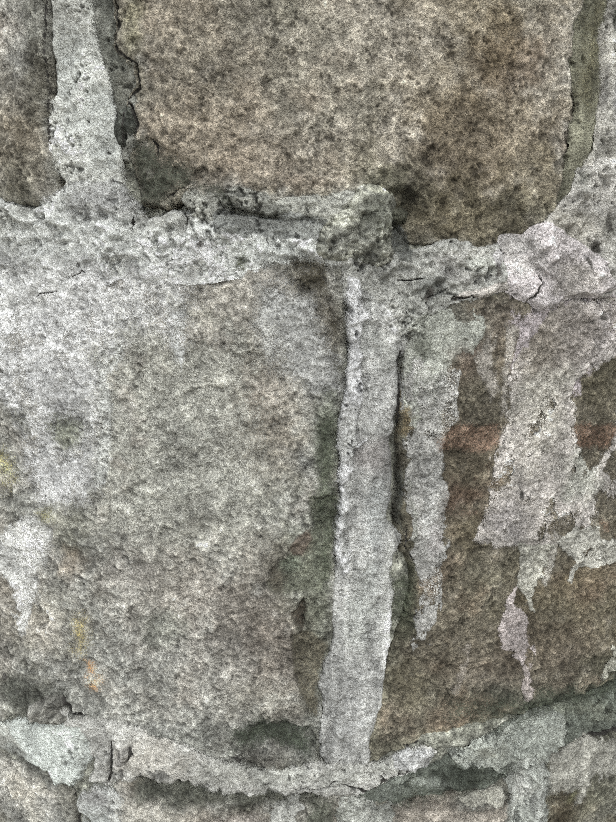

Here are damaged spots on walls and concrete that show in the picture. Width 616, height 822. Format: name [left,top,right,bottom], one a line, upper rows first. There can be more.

crack [115,0,159,155]
crack [397,278,474,300]